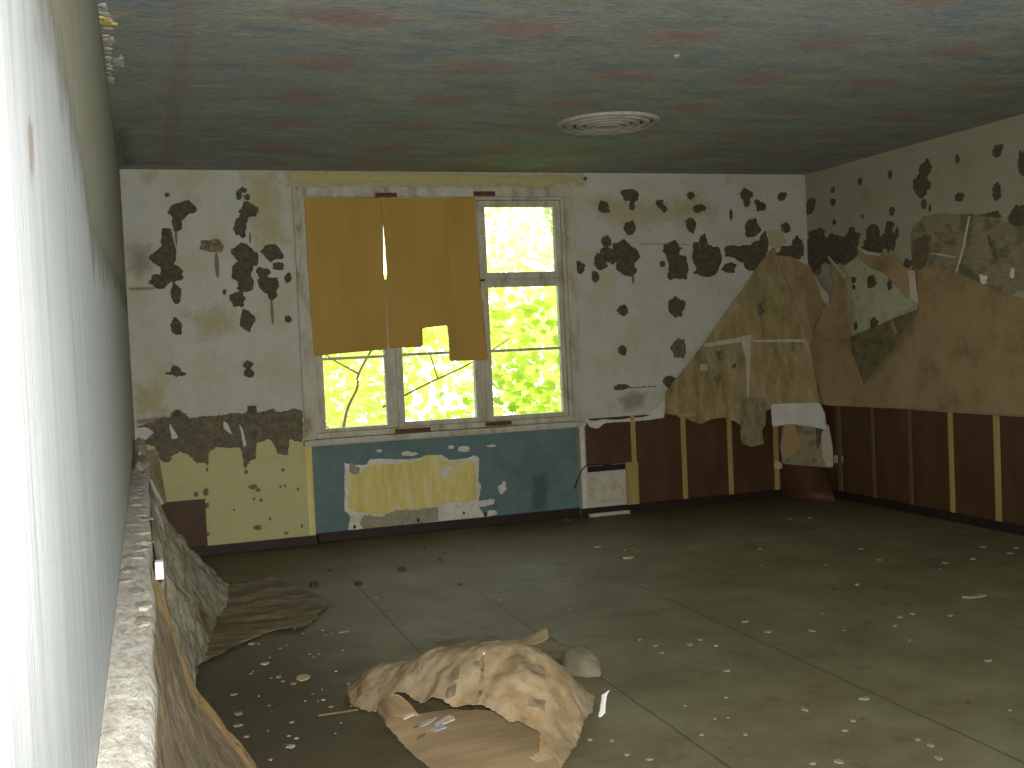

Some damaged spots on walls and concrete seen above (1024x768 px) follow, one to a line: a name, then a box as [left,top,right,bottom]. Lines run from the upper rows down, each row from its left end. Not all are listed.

spalling [913,158,932,212]
spalling [1007,205,1024,227]
spalling [148,192,197,304]
spalling [199,187,292,332]
peeling [659,187,914,335]
spalling [165,365,186,377]
spalling [170,317,182,335]
spalling [243,360,254,378]
spalling [662,375,676,388]
spalling [670,338,686,358]
spalling [137,405,304,502]
peeling [344,445,507,530]